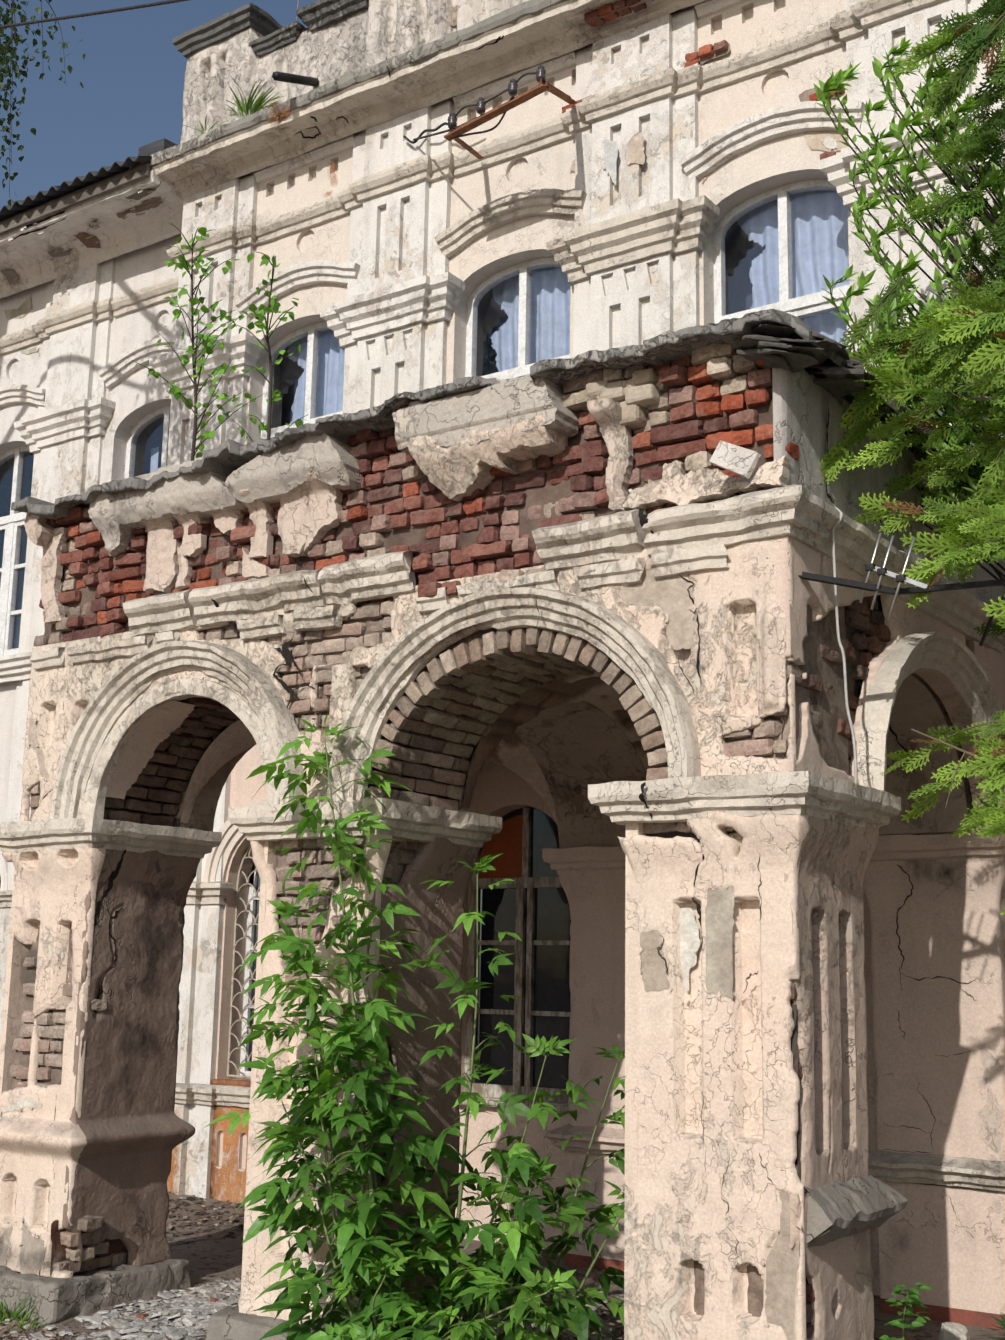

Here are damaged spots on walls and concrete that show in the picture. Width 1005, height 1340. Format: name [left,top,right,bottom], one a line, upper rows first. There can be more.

spalling [584,0,654,27]
spalling [684,40,730,68]
spalling [33,324,883,650]
spalling [723,595,891,776]
spalling [643,822,697,838]
spalling [726,827,743,853]
spalling [0,941,73,1115]
spalling [91,989,107,1011]
crack [94,850,126,1000]
flaking render [637,908,700,995]
crack [896,864,977,1039]
crack [883,1050,977,1153]